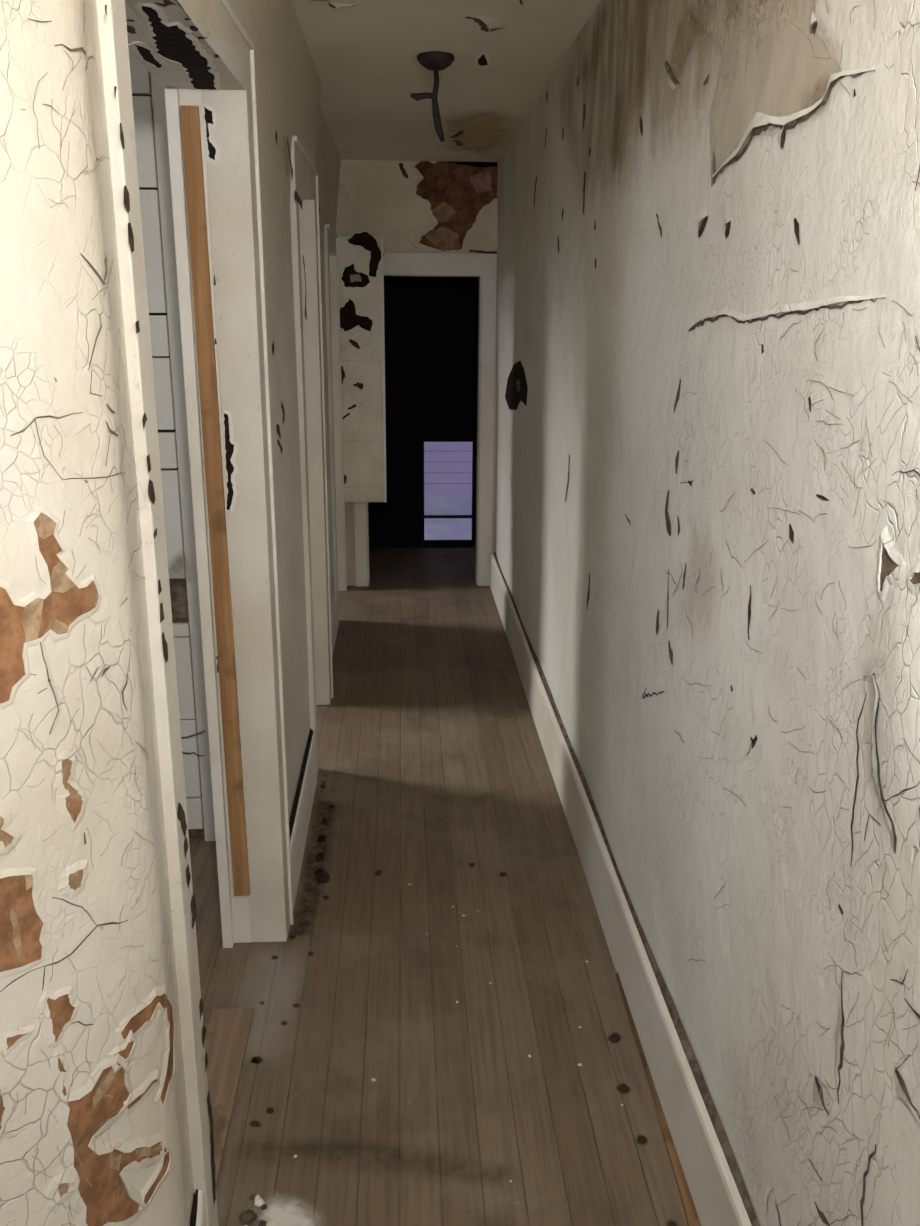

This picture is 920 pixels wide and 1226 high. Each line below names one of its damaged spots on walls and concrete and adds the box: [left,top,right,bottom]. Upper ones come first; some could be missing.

spalling [126,0,223,165]
water stain [673,0,837,171]
crack [10,253,145,607]
peeling [340,230,386,349]
spalling [505,358,529,413]
crack [688,294,920,519]
peeling [0,504,102,711]
crack [656,450,846,686]
peeling [0,807,49,979]
crack [0,641,153,992]
crack [746,673,920,1226]
peeling [0,984,175,1226]